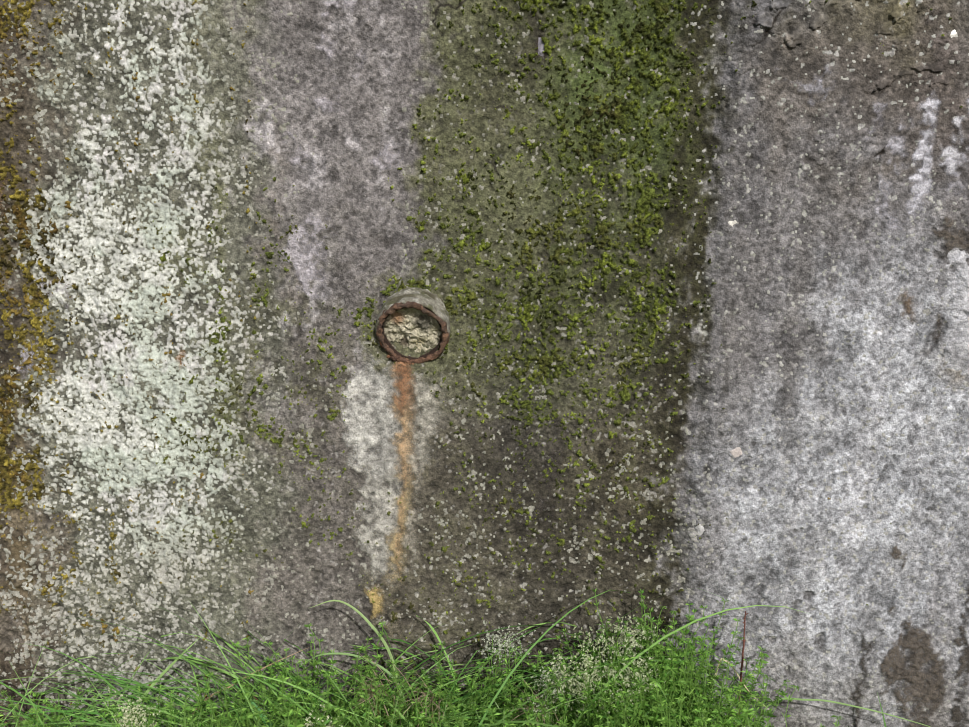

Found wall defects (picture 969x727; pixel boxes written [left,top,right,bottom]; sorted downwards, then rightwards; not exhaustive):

water stain [341,359,440,592]
rust [386,354,414,574]
rust [367,589,382,618]
water stain [850,635,873,727]
water stain [880,587,969,727]